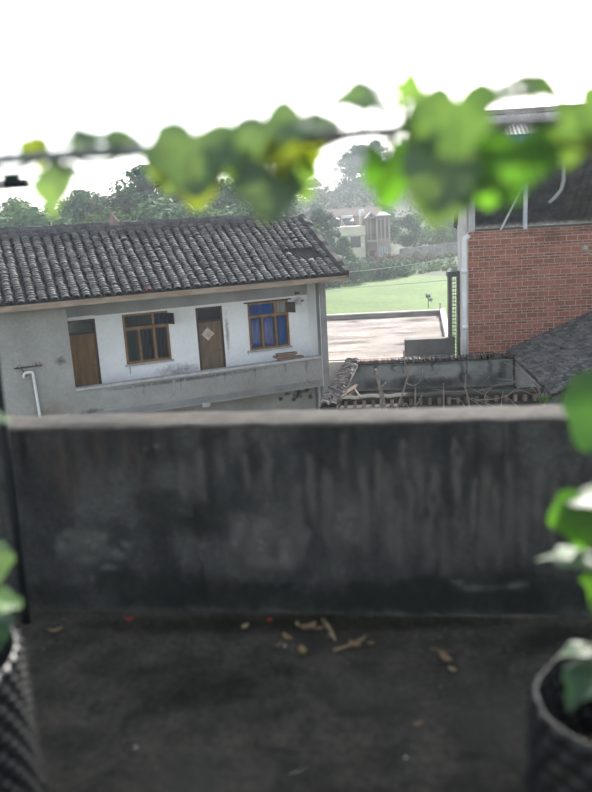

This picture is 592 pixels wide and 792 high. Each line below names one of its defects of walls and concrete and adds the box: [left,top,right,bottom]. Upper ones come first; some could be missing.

water stain [226,453,541,611]